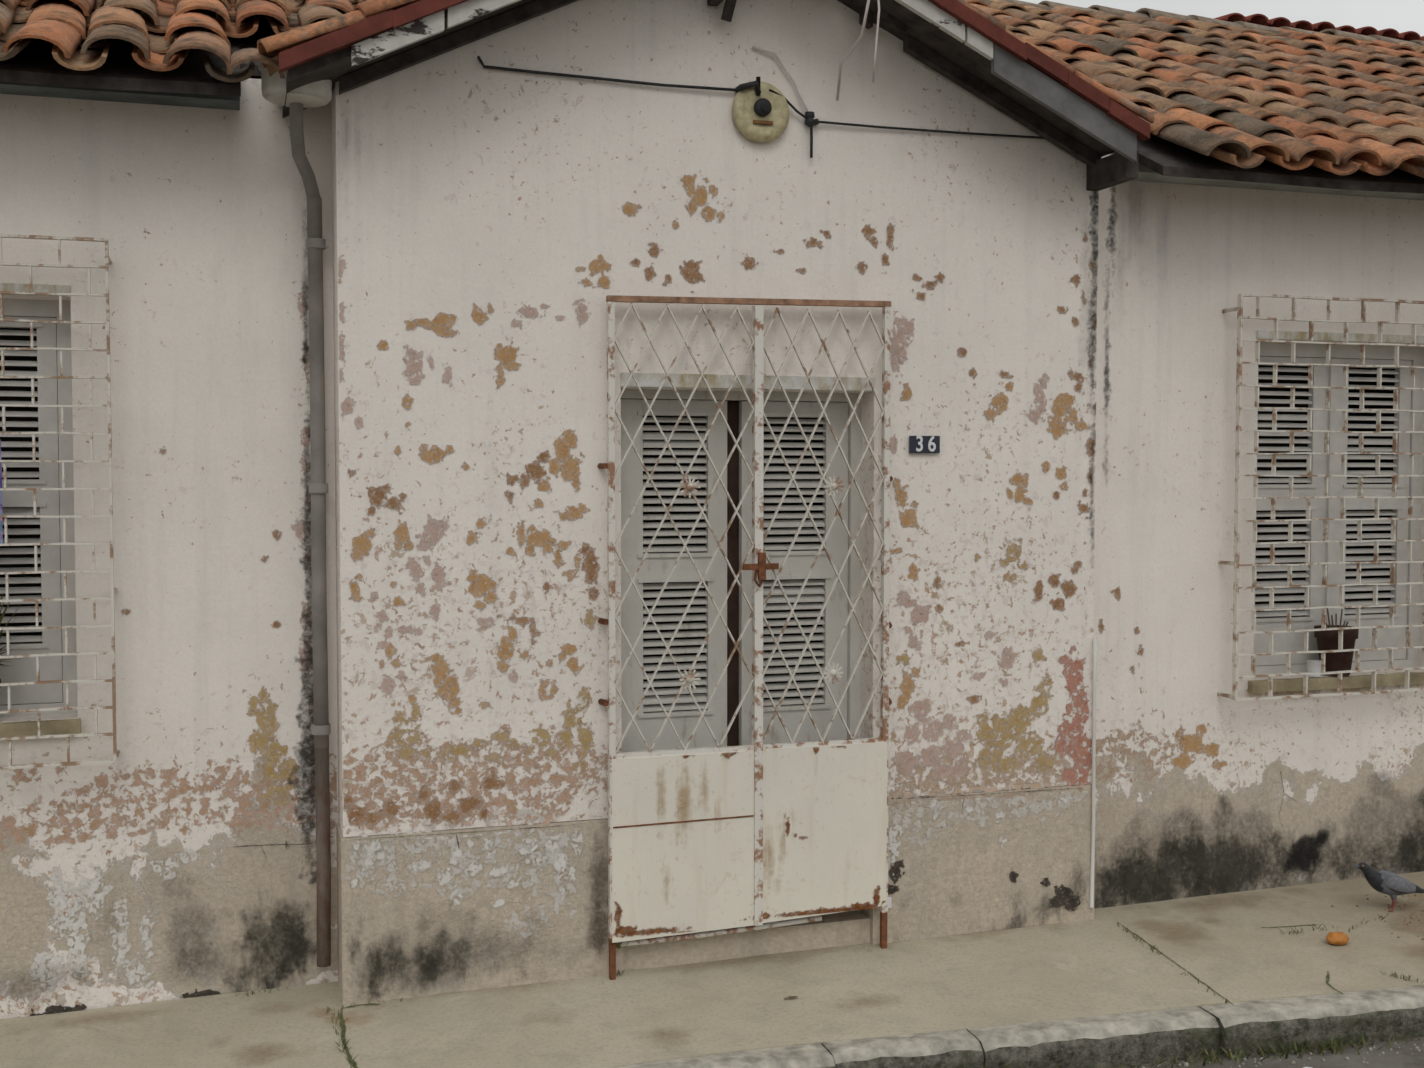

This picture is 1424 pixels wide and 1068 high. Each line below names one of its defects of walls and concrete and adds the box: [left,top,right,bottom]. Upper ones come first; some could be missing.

peeling [377,302,494,431]
peeling [1006,356,1096,515]
peeling [504,428,600,632]
peeling [0,483,608,1016]
peeling [888,548,1424,911]
water stain [247,905,308,986]
water stain [368,936,460,987]
corrosion [614,902,691,938]
corrosion [744,886,885,920]
water stain [1094,839,1263,907]
water stain [1284,831,1328,870]
water stain [1398,820,1424,872]